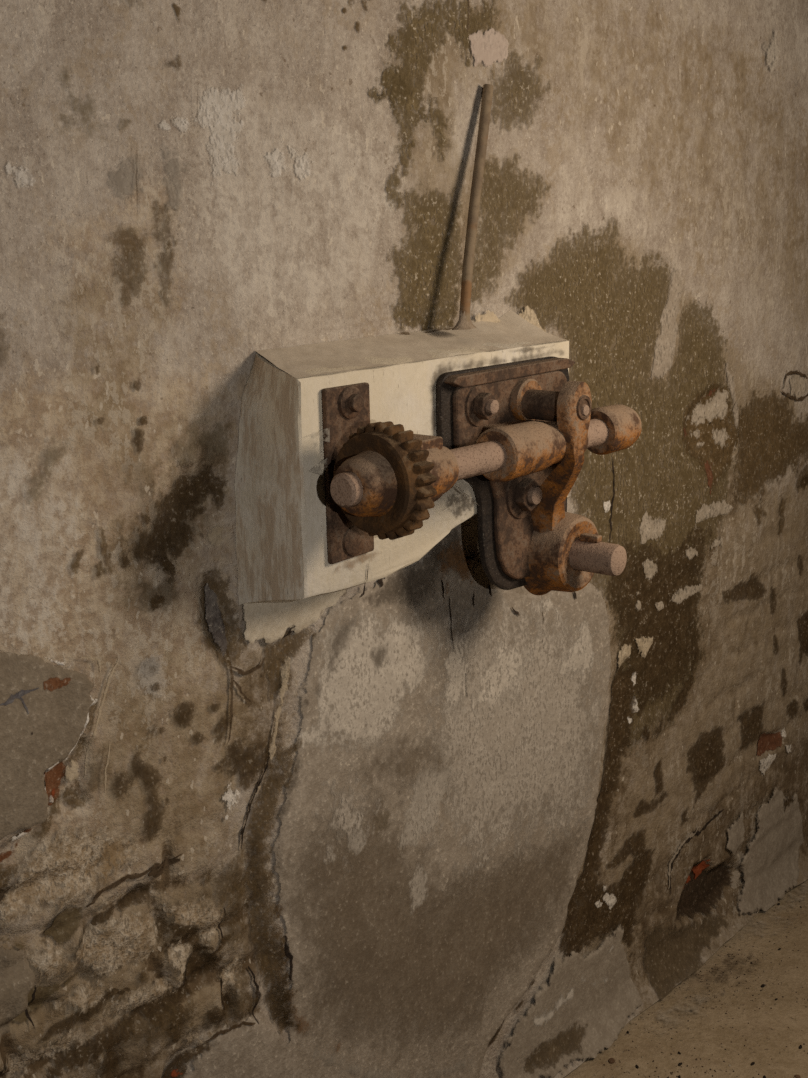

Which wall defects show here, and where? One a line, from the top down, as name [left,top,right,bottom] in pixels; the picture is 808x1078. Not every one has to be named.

leakage [368,0,551,331]
leakage [0,221,808,1057]
peeling [43,677,71,691]
crack [226,649,264,742]
spalling [44,761,66,805]
crack [241,745,269,849]
spalling [0,844,17,892]
spalling [186,932,234,985]
crack [284,935,293,981]
crack [203,966,261,1043]
leakage [0,1028,82,1078]
spalling [163,1042,211,1078]